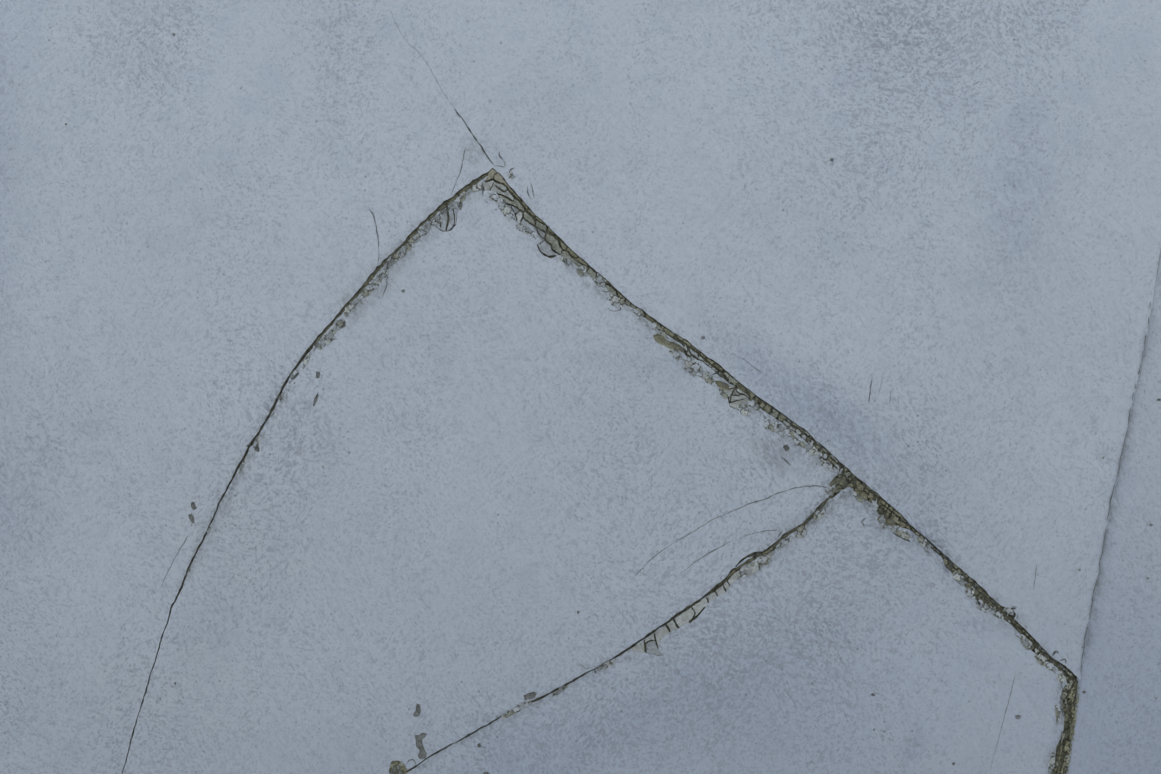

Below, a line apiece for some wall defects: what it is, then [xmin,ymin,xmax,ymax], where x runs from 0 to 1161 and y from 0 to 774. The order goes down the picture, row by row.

crack [170,10,1097,774]
crack [1099,302,1151,568]